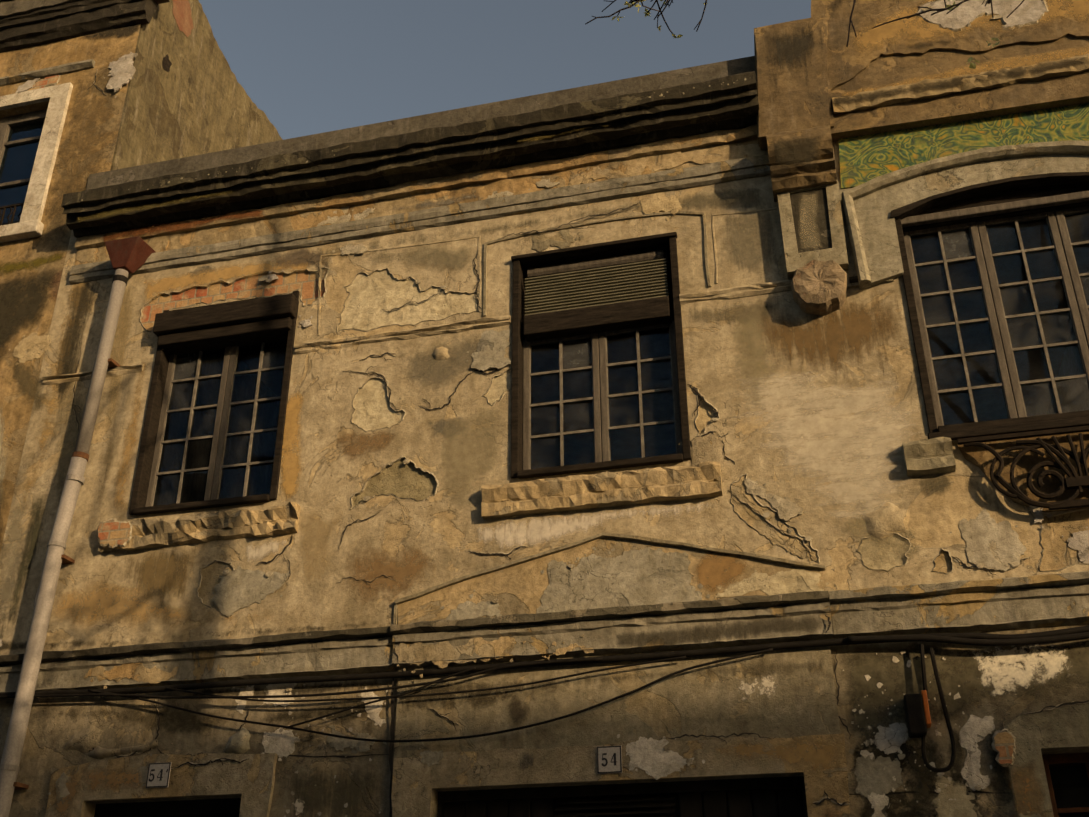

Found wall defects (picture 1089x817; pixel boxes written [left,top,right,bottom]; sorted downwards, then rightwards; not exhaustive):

flaking render [916,0,1049,32]
flaking render [104,52,138,98]
leakage [0,273,54,351]
flaking render [139,267,329,333]
crack [382,292,443,312]
leakage [14,282,95,494]
crack [342,352,509,413]
crack [688,384,735,464]
leakage [690,301,917,558]
flaking render [349,456,439,510]
crack [728,490,815,561]
flaking render [1029,505,1089,572]